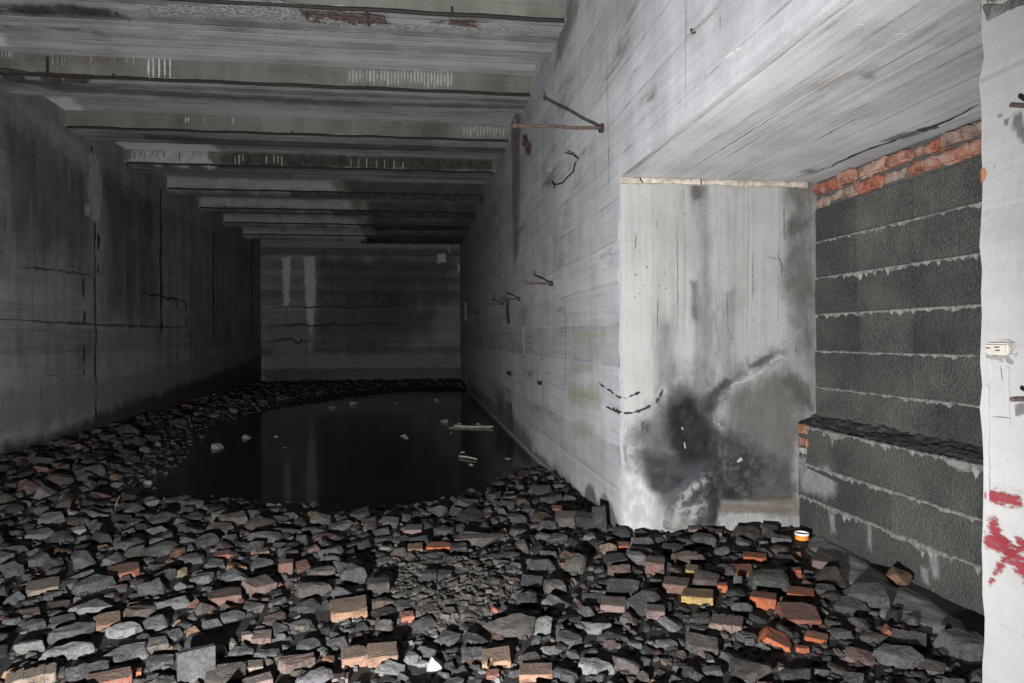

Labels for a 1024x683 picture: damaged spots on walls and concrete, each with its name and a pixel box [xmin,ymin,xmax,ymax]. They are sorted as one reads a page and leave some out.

crack [693,115,776,167]
crack [815,105,978,173]
crack [0,189,187,417]
crack [599,383,663,415]